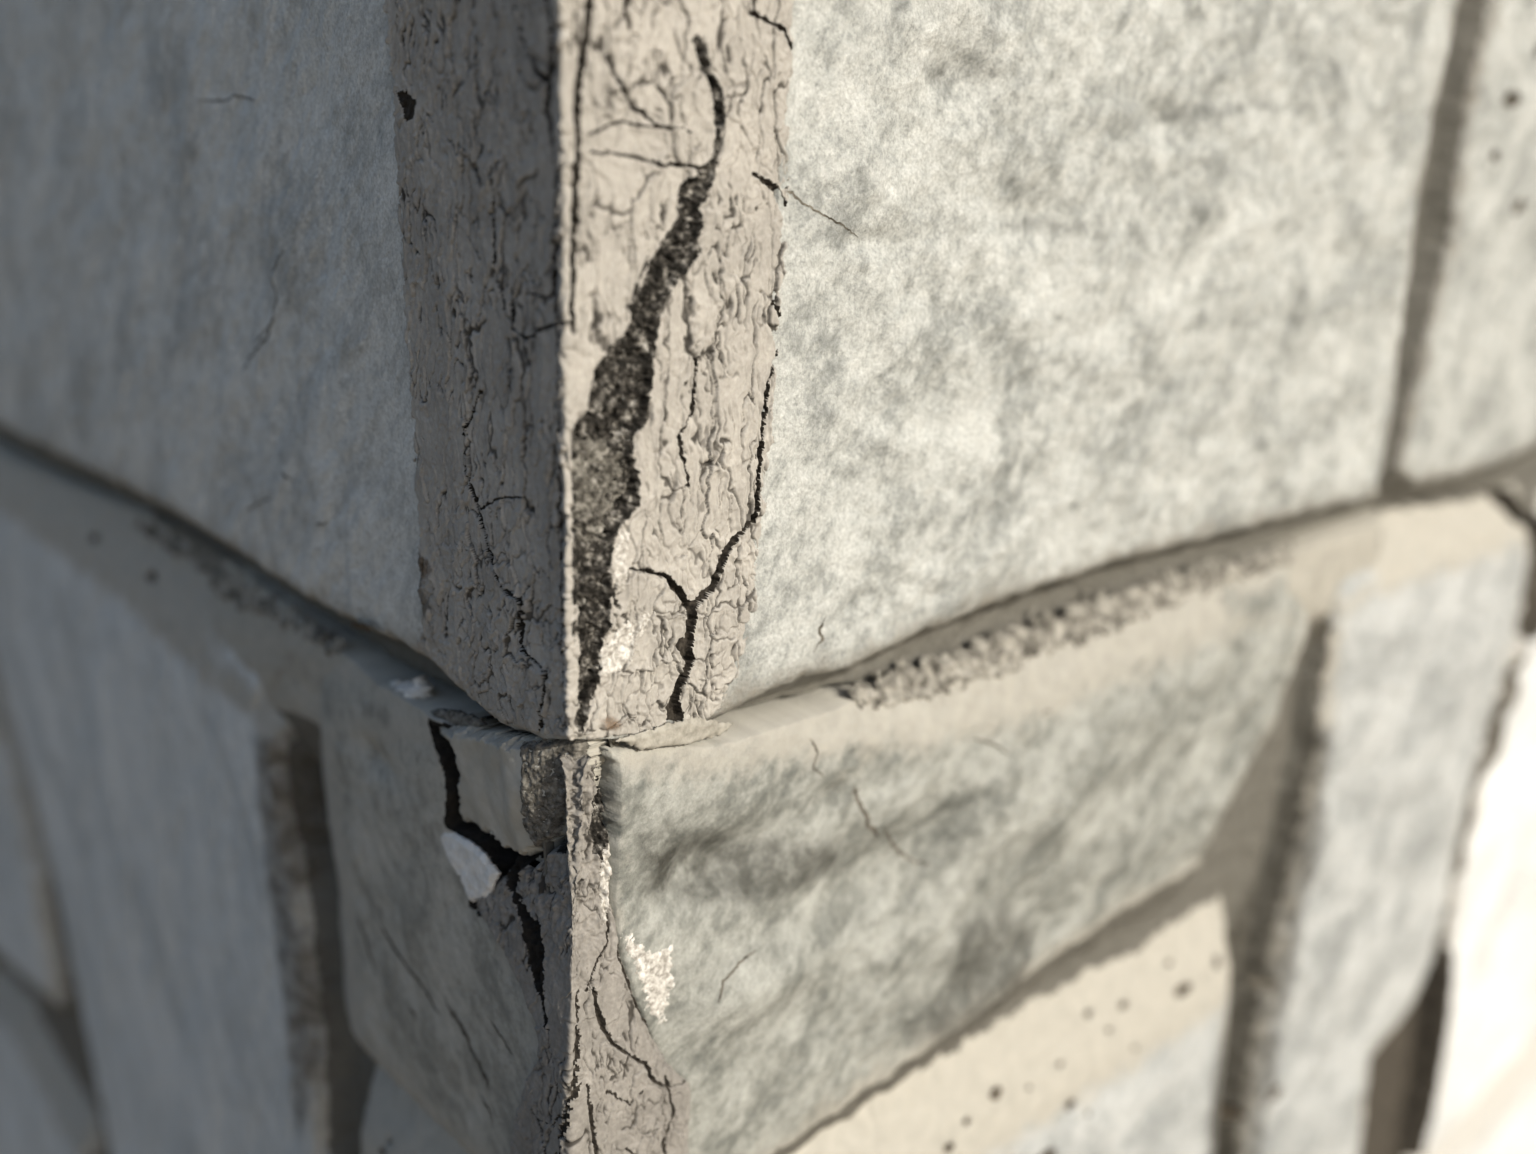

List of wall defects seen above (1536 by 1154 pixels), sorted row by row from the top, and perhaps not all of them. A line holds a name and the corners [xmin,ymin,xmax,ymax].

crack [462,0,857,1154]
peeling [441,832,501,902]
crack [356,916,512,1120]